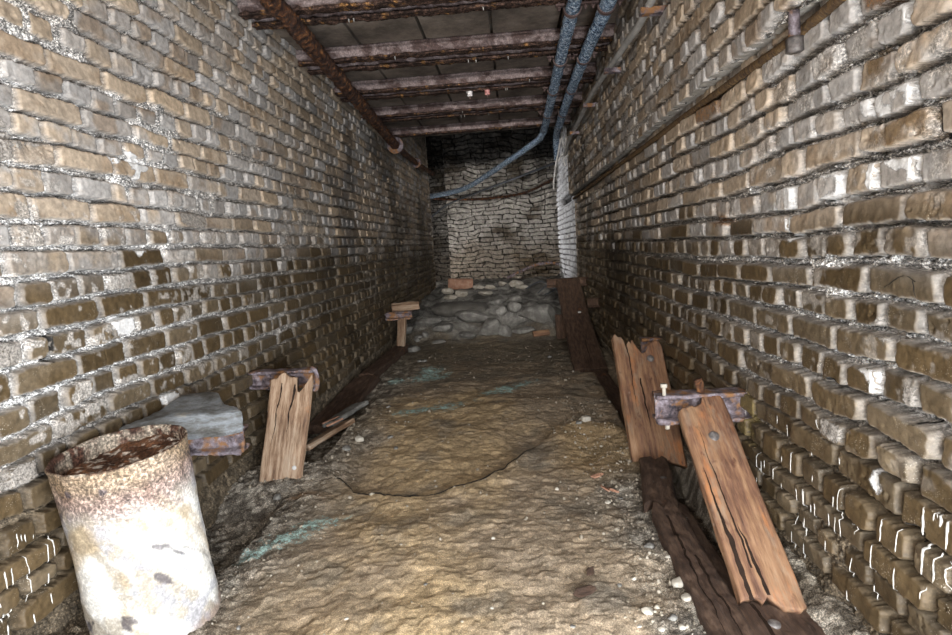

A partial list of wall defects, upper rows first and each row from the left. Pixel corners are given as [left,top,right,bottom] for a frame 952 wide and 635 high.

damp [903,384,933,421]
damp [816,414,855,443]
crack [337,447,535,497]
damp [869,469,887,494]
damp [791,489,815,556]
damp [919,507,952,599]